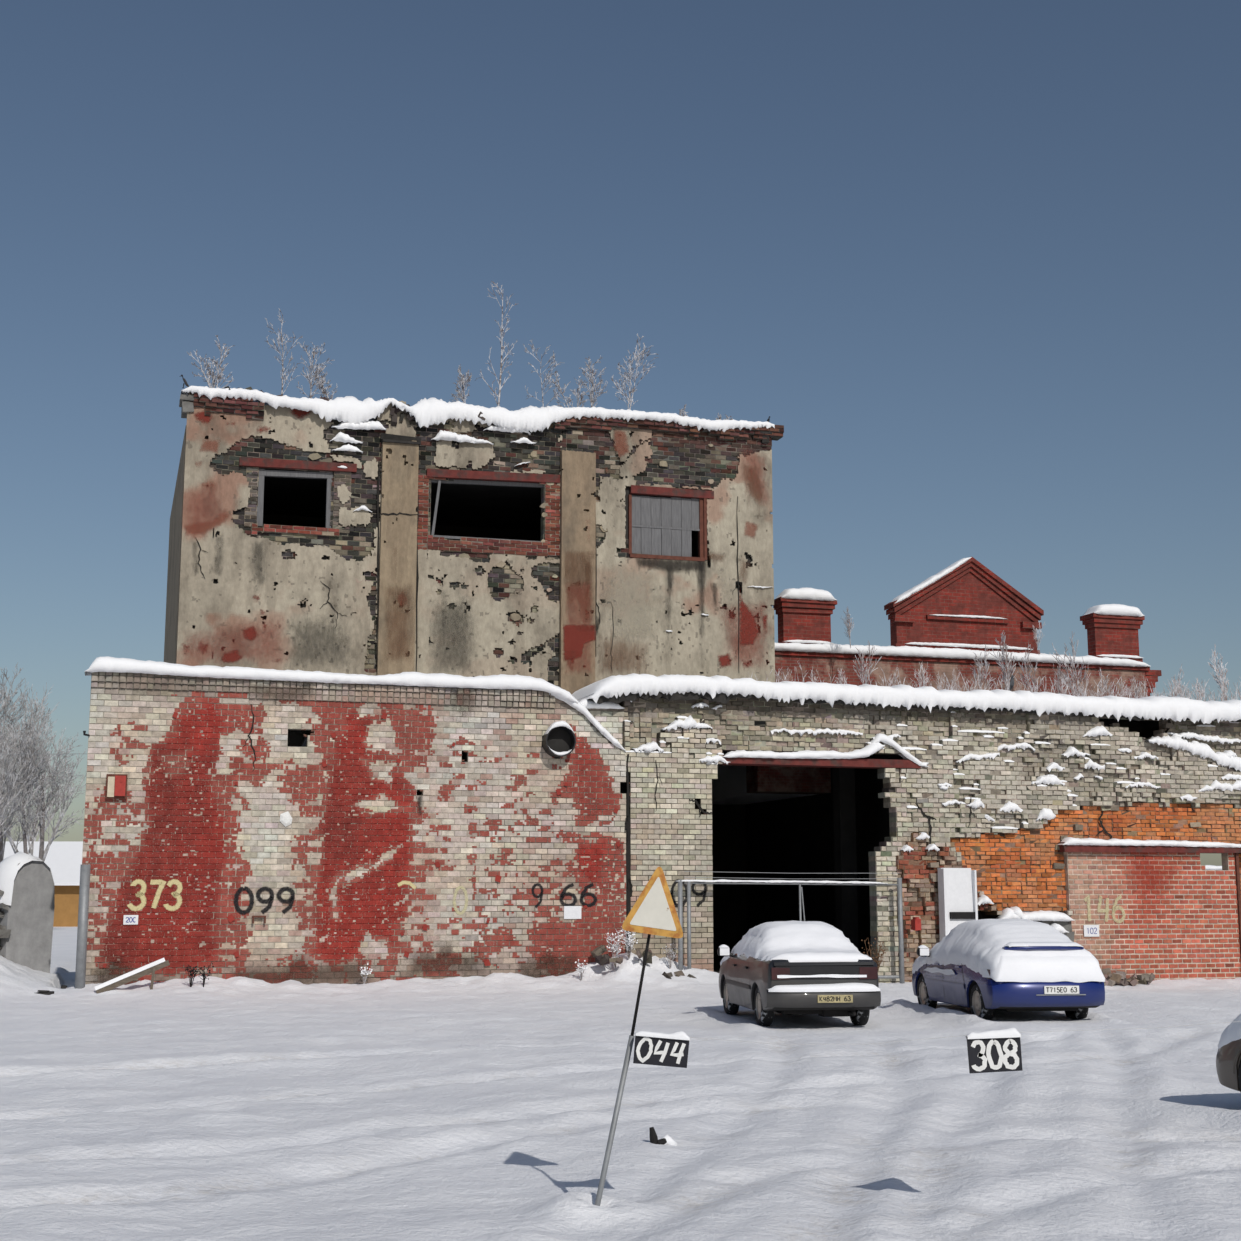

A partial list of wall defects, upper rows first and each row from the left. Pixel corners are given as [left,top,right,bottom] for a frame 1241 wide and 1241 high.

spalling [410,418,772,542]
spalling [187,419,391,673]
spalling [596,524,638,566]
spalling [427,538,596,687]
peeling [739,596,767,645]
peeling [719,654,751,666]
crack [243,704,256,771]
peeling [82,691,631,985]
crack [1096,811,1112,839]